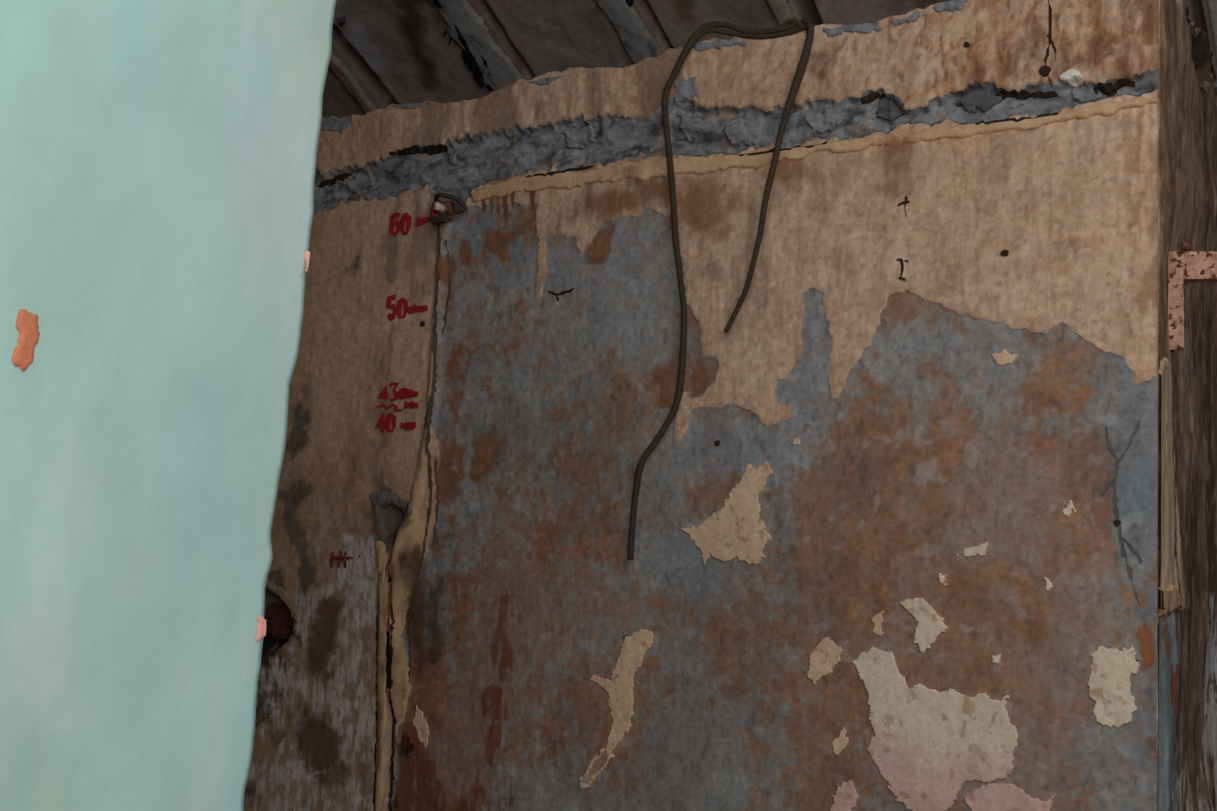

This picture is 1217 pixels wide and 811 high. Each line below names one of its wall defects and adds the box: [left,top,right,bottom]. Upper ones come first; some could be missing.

spalling [682,36,747,51]
spalling [823,0,968,37]
peeling [11,309,40,372]
damp [287,403,309,456]
crack [421,225,451,560]
peeling [314,65,1186,811]
flaking render [255,578,299,658]
damp [244,481,443,811]
crack [405,603,413,680]
corrosion [482,593,513,768]
corrosion [395,724,441,811]